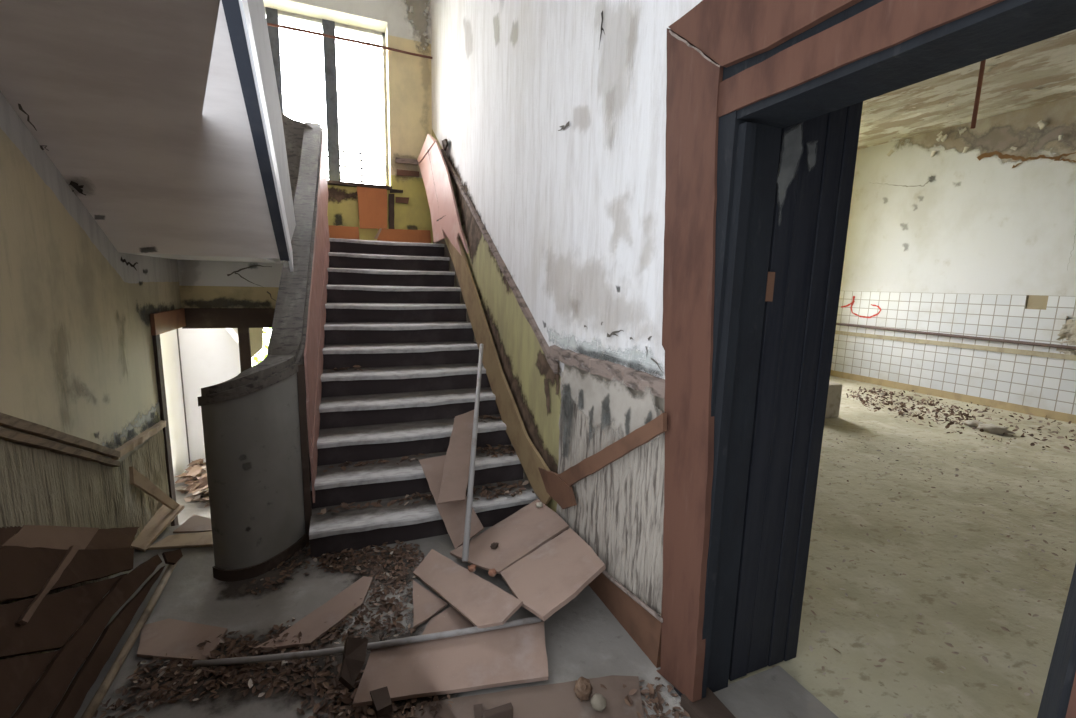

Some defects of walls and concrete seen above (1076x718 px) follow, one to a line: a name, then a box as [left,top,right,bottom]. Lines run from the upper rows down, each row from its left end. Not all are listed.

peeling [405,0,430,52]
flaking render [887,96,1076,168]
leakage [446,155,610,474]
leakage [567,347,661,376]
spalling [1056,319,1076,355]
leakage [94,412,159,449]